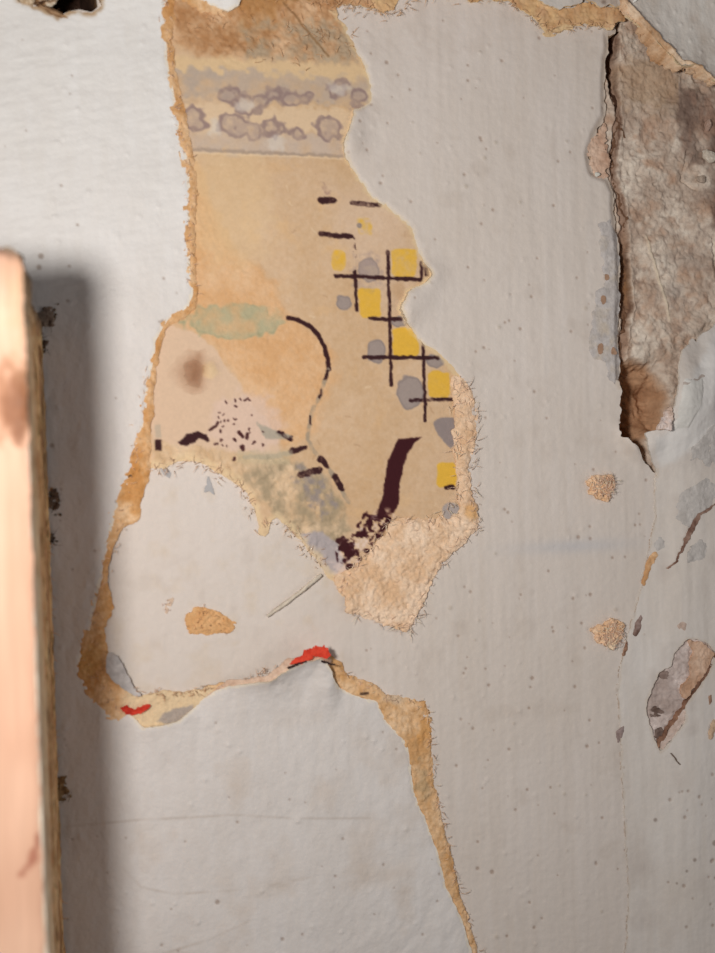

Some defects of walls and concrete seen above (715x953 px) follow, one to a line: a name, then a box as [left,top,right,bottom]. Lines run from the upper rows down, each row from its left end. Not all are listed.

flaking render [537,0,715,472]
peeling [0,0,472,953]
spalling [646,622,715,749]